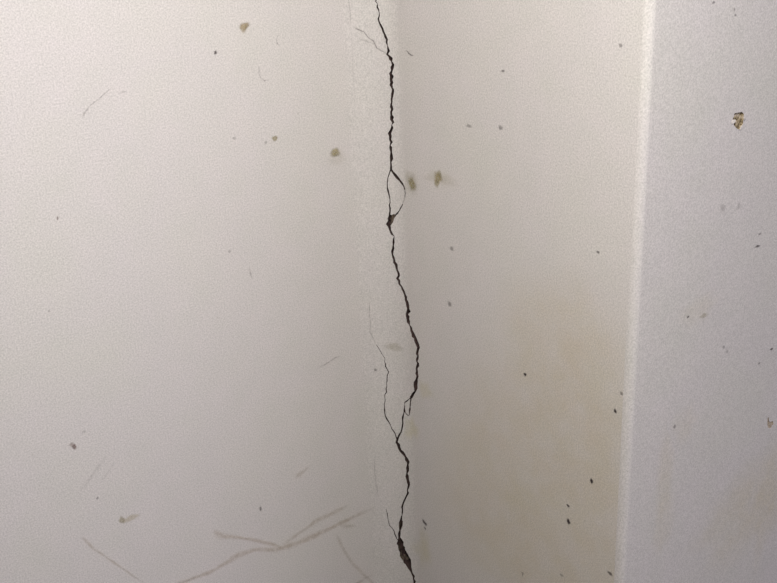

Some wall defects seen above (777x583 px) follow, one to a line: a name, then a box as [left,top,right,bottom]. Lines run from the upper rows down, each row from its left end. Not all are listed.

crack [358,0,420,583]